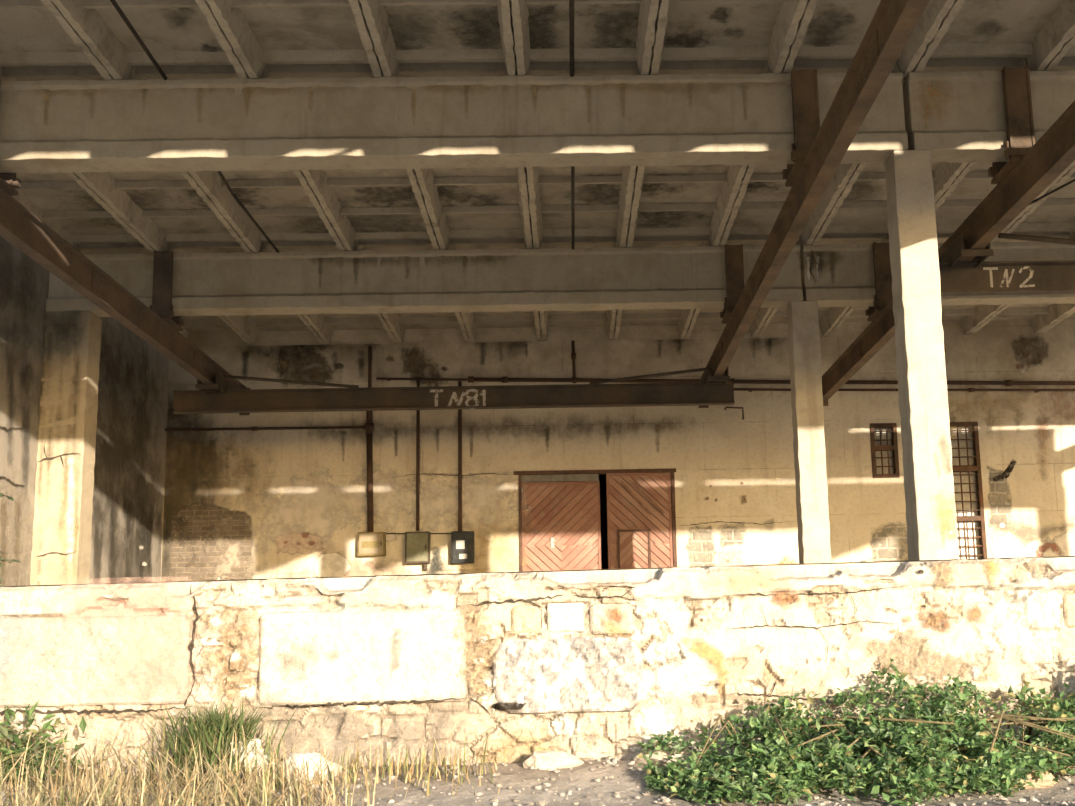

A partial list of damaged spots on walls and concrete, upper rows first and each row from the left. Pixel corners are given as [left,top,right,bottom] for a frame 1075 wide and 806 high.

leakage [528,6,558,49]
leakage [665,30,708,48]
flaking render [265,345,344,385]
flaking render [1012,337,1048,373]
crack [0,426,81,467]
leakage [66,458,74,561]
peeling [169,470,519,581]
leakage [432,551,440,571]
flaking render [687,525,744,567]
flaking render [988,459,1053,540]
crack [732,587,911,661]
corrosion [687,642,725,693]